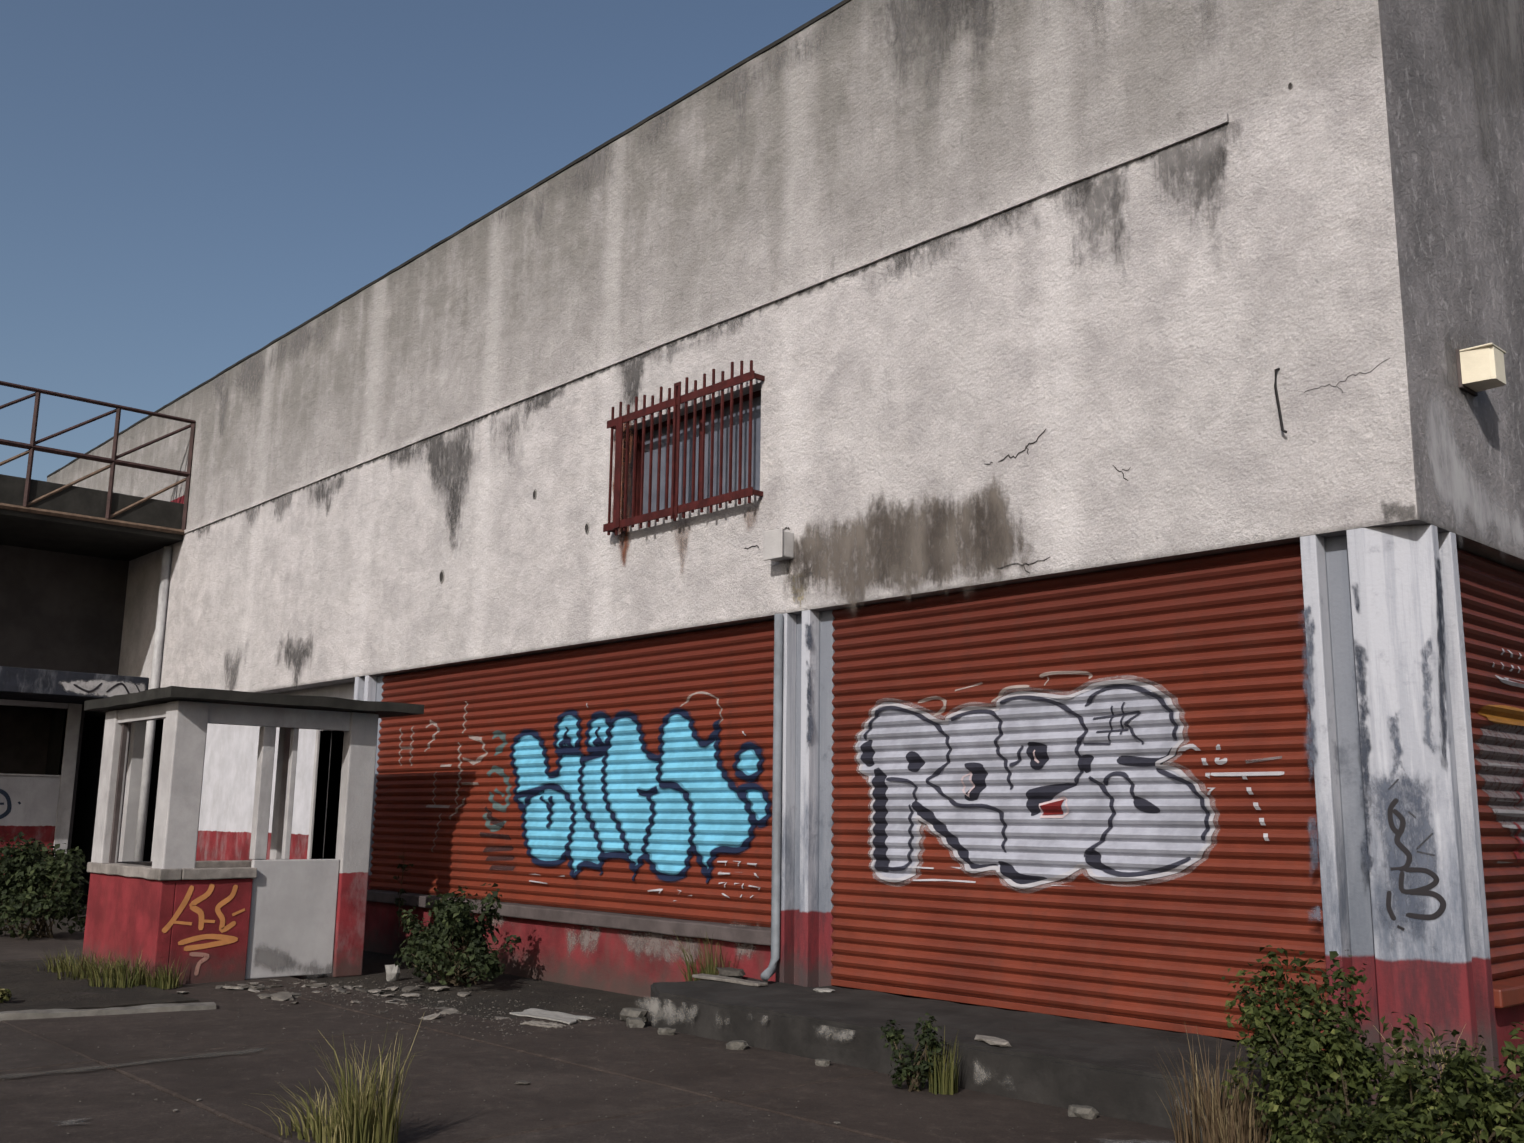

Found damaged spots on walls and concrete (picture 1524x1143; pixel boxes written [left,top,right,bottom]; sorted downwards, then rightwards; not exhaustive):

leakage [887,0,989,74]
leakage [193,122,1238,547]
crack [1304,358,1390,393]
crack [986,429,1046,465]
rust [676,524,687,567]
leakage [788,481,1024,606]
leakage [225,653,240,690]
leakage [278,639,312,686]
peeling [1303,607,1317,775]
peeling [1422,559,1448,766]
peeling [1354,641,1437,937]
peeling [1308,817,1319,869]